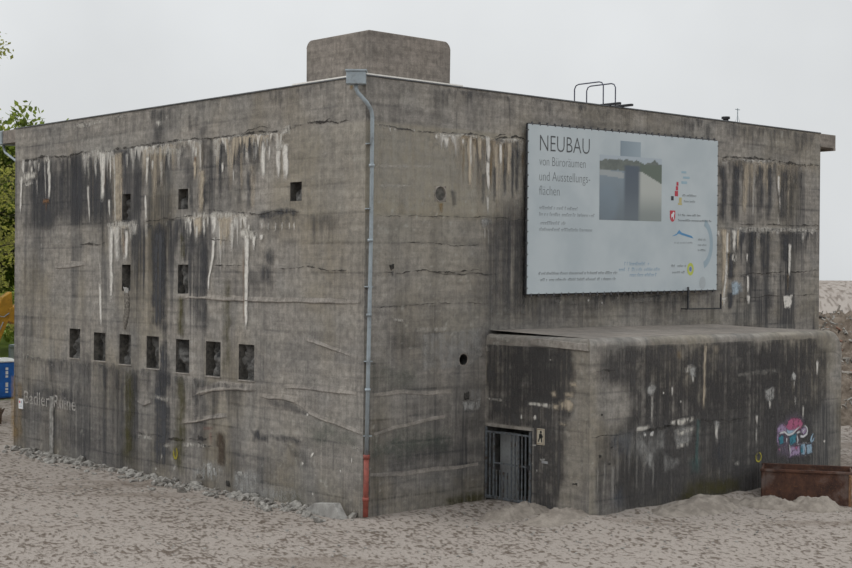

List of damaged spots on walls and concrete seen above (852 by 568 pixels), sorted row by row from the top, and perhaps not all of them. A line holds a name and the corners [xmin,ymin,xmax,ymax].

water stain [20,139,295,334]
crack [23,118,346,162]
water stain [215,127,289,202]
crack [388,268,488,276]
crack [379,124,524,140]
water stain [435,133,525,310]
water stain [717,159,816,308]
water stain [144,341,192,469]